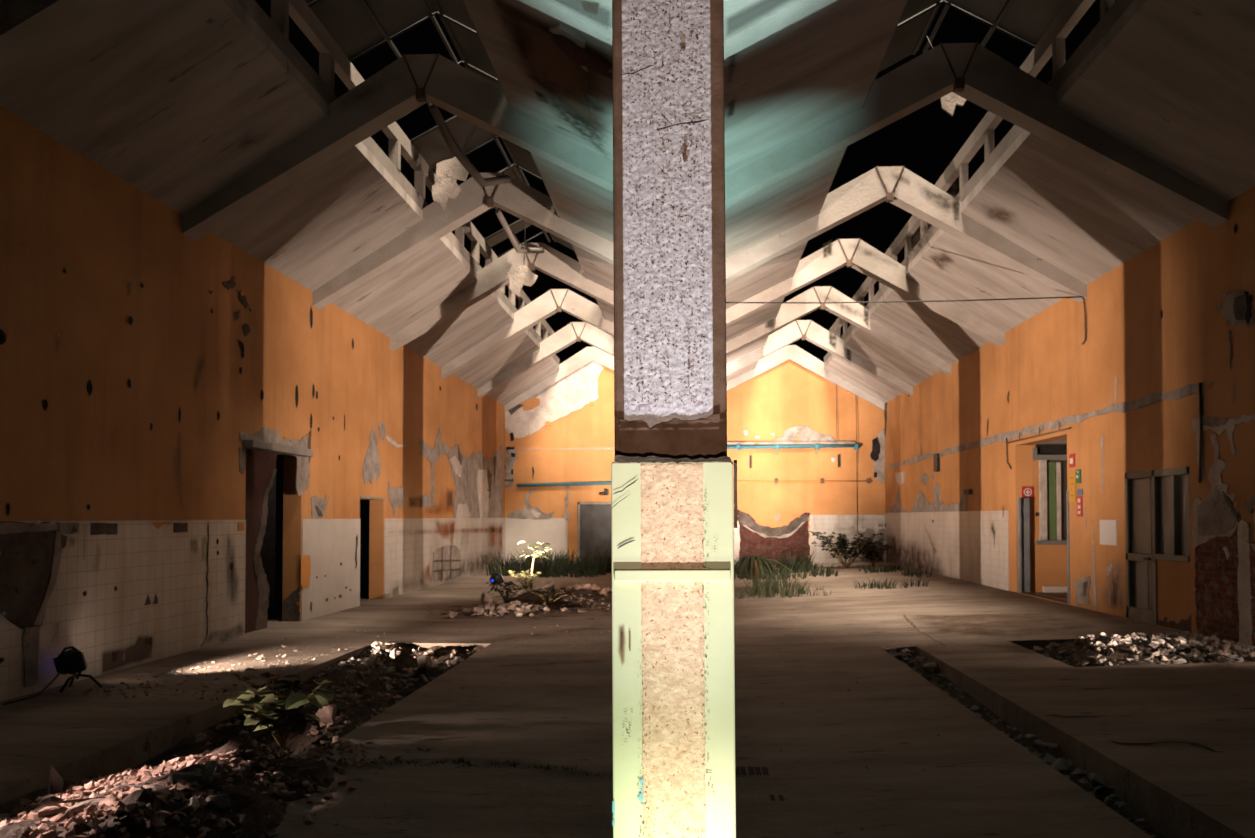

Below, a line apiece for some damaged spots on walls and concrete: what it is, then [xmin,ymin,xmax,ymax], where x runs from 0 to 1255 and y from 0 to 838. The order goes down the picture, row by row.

peeling [497,0,817,565]
flaking render [239,414,330,519]
flaking render [295,383,318,409]
flaking render [362,361,606,521]
flaking render [743,426,835,442]
peeling [0,503,118,632]
flaking render [1157,414,1255,649]